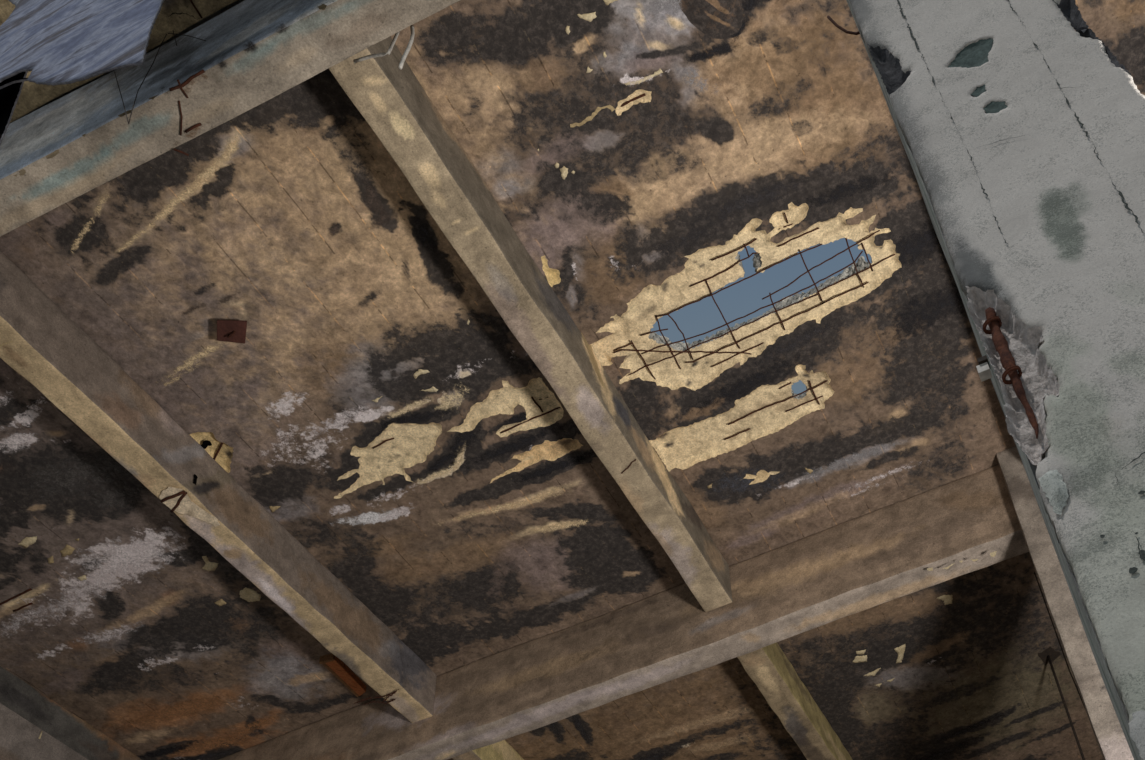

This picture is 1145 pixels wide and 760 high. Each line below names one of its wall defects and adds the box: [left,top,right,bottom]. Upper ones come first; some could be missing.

spalling [615,69,663,116]
damp [683,44,733,91]
crack [897,0,1028,244]
spalling [590,202,902,391]
efflorescence [0,433,32,452]
damp [372,386,467,438]
spalling [334,377,583,499]
spalling [649,364,835,472]
corrosion [983,307,1039,439]
spalling [965,286,1069,515]
efflorescence [333,504,408,525]
efflorescence [50,537,177,616]